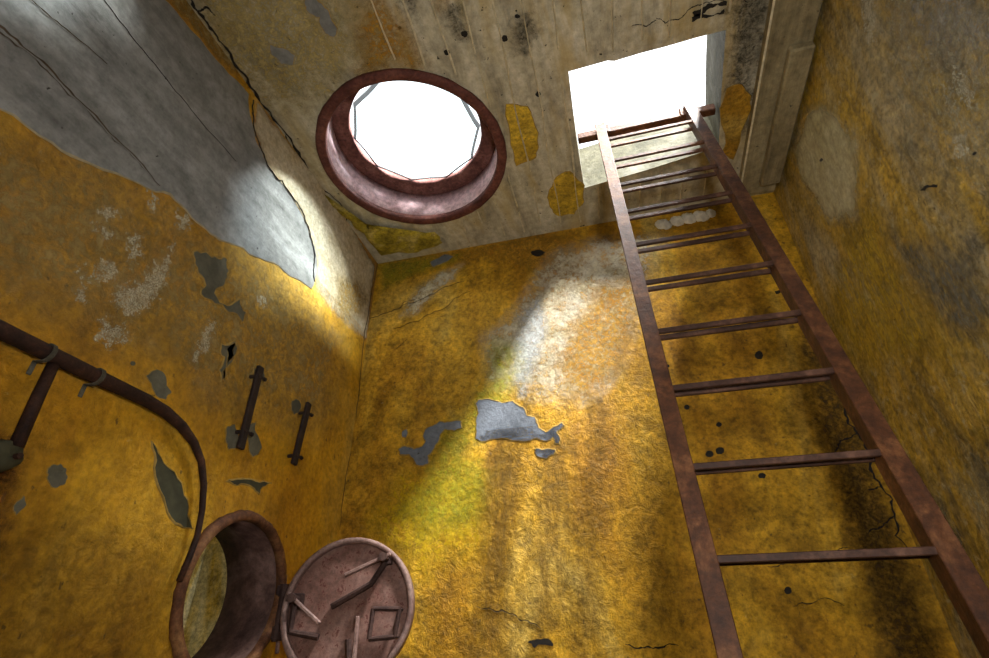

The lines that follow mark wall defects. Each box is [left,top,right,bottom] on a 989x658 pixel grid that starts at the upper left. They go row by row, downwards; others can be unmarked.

peeling [0,0,374,347]
peeling [186,321,238,382]
peeling [225,422,262,458]
peeling [398,419,463,467]
peeling [474,398,565,460]
peeling [151,441,192,529]
crack [835,408,907,547]